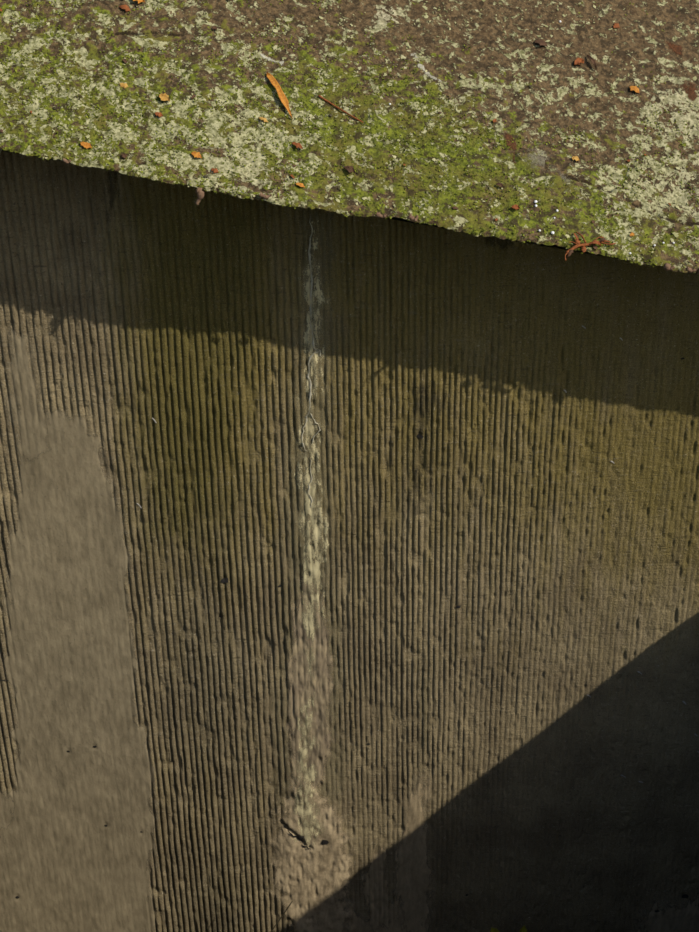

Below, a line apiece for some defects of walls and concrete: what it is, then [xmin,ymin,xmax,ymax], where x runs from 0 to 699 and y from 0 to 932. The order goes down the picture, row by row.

damp [285,220,335,847]